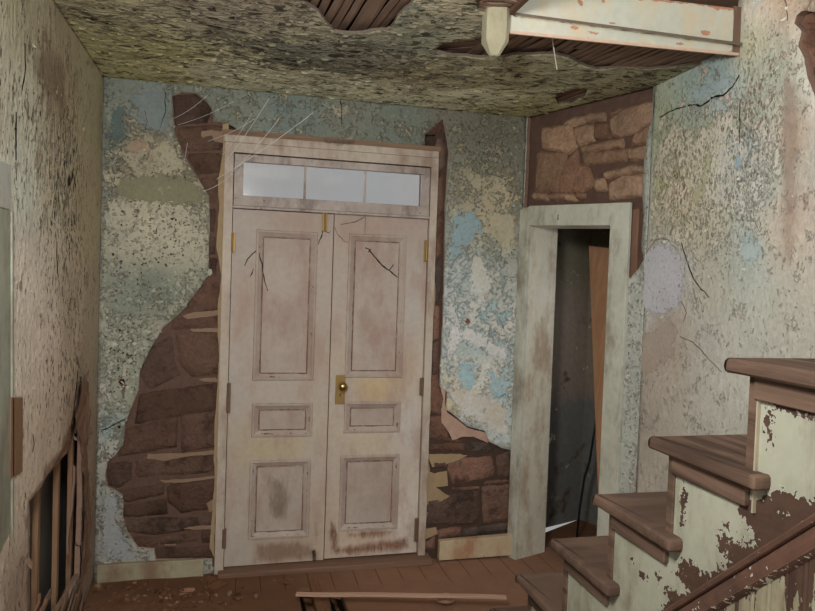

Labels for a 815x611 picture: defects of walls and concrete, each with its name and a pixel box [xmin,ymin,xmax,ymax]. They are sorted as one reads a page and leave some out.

flaking render [798,3,815,75]
crack [653,75,741,144]
flaking render [68,0,766,567]
crack [646,238,709,298]
crack [680,301,720,371]
flaking render [26,372,91,611]